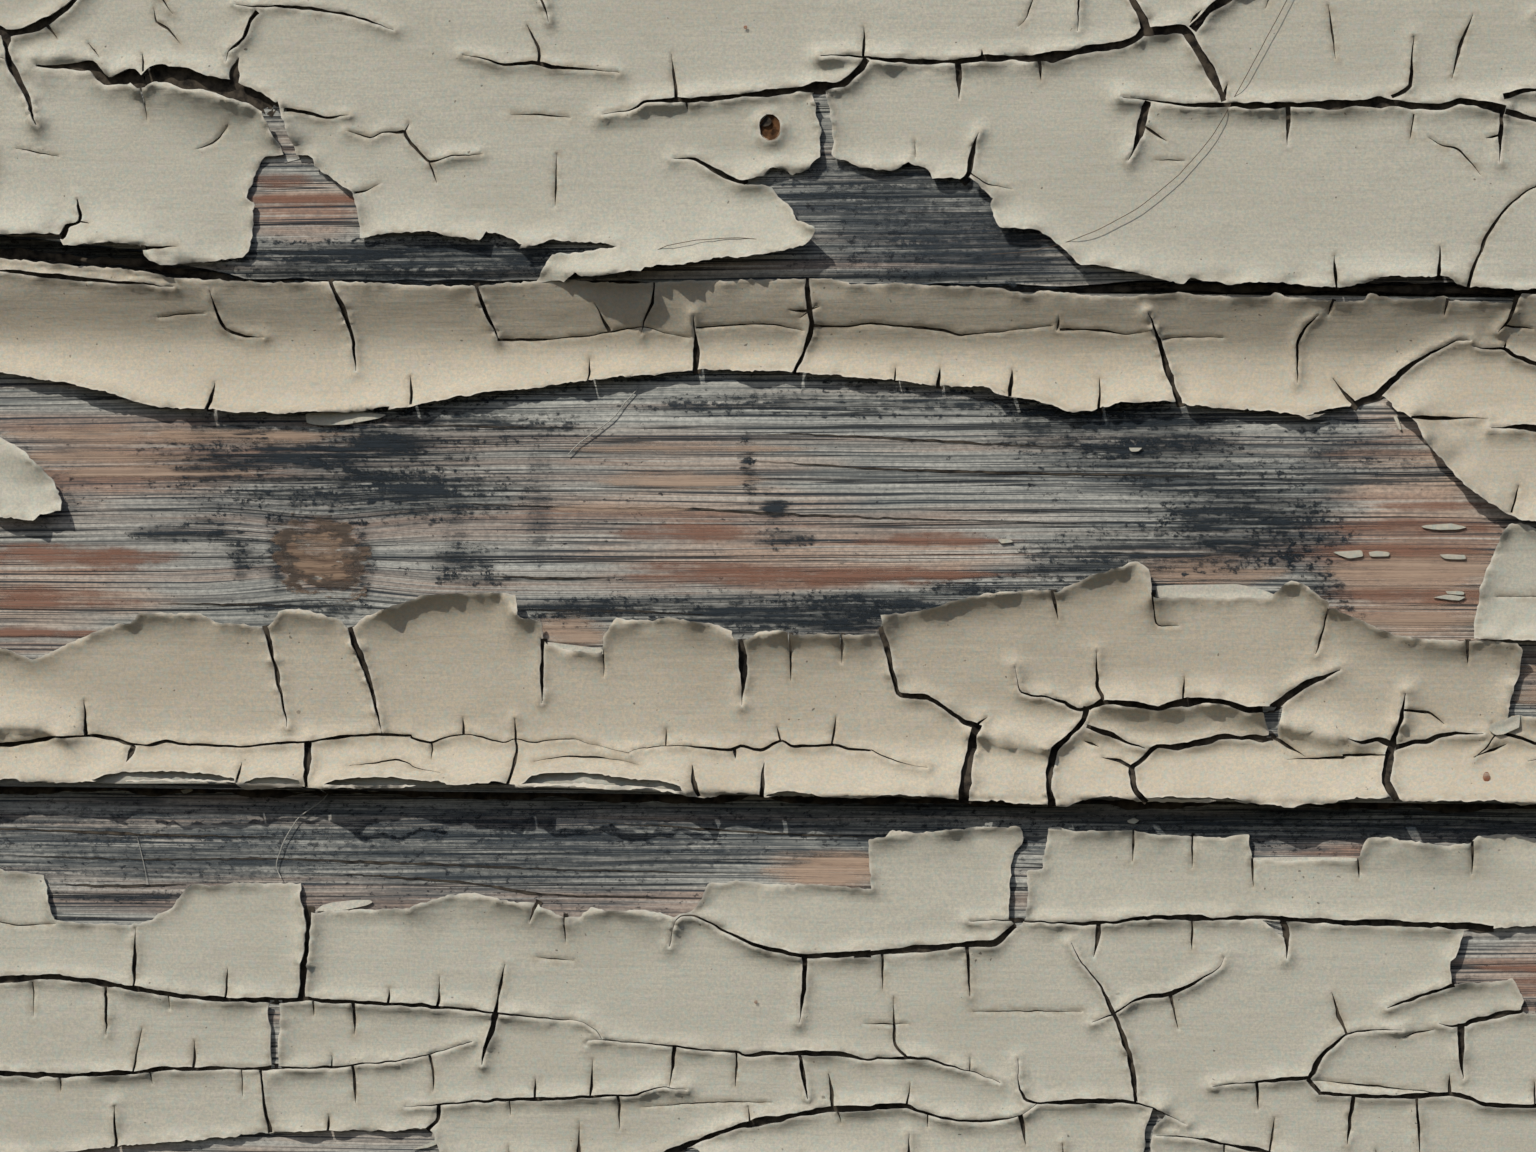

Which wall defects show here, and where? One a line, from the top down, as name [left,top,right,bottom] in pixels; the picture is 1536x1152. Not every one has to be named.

crack [0,0,479,182]
crack [465,0,619,73]
crack [519,0,1536,175]
crack [0,199,259,338]
peeling [0,0,1536,808]
crack [474,278,1218,407]
crack [1296,186,1536,432]
crack [0,576,922,837]
crack [840,626,986,804]
crack [1015,608,1536,861]
peeling [0,818,1536,1152]
crack [0,828,1536,1152]